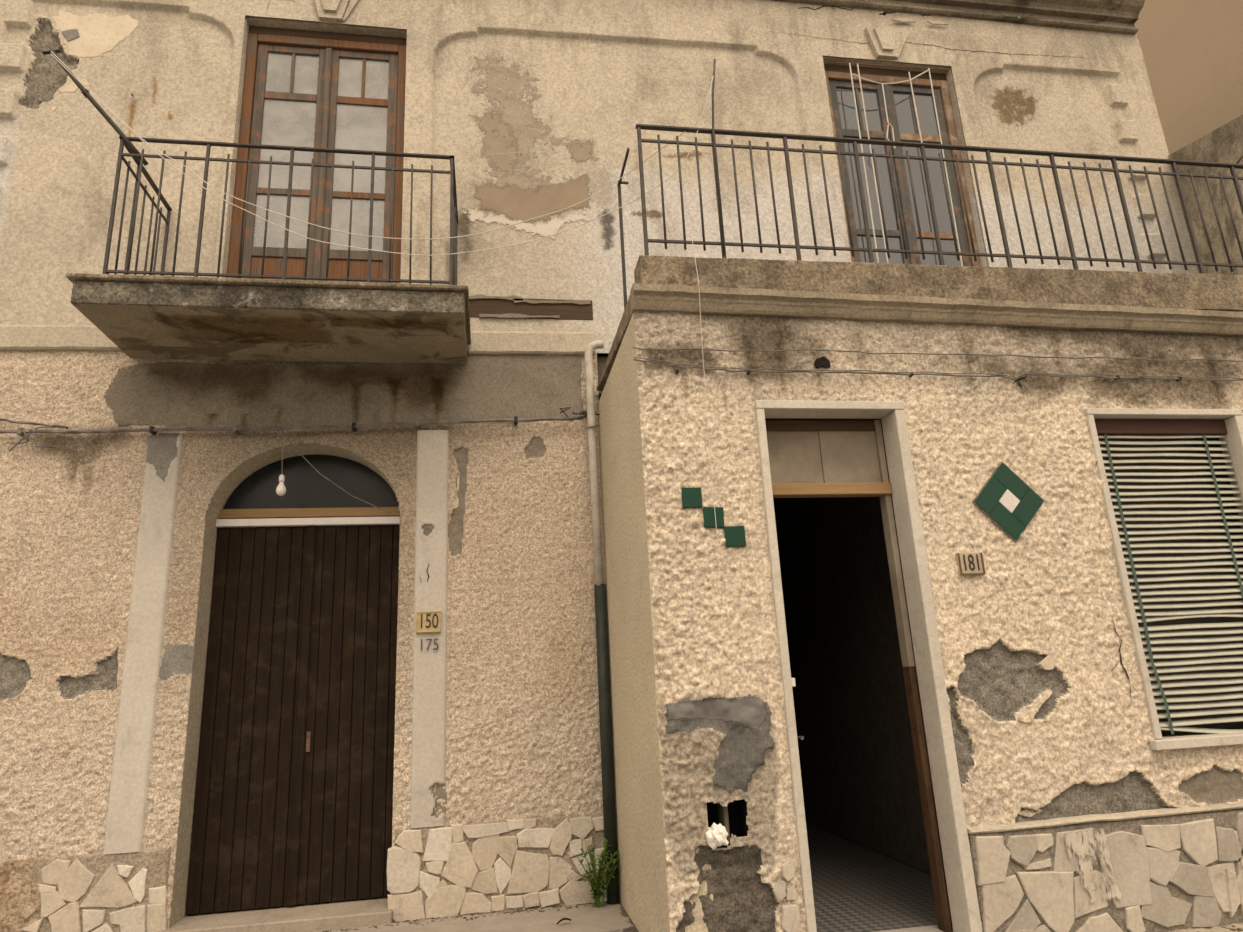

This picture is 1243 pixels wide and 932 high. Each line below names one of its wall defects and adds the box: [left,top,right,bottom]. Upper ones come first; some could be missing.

spalling [18,7,139,117]
peeling [462,51,598,239]
spalling [421,446,468,556]
spalling [0,653,32,700]
spalling [56,647,119,699]
spalling [946,639,1071,788]
spalling [1015,771,1175,823]
spalling [1178,765,1243,805]
spalling [676,799,800,932]